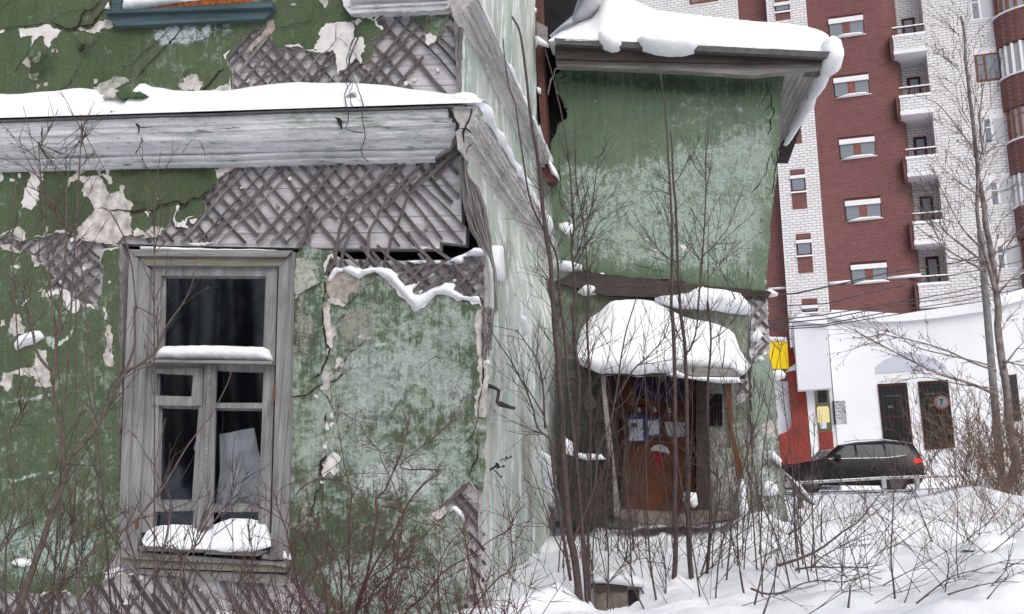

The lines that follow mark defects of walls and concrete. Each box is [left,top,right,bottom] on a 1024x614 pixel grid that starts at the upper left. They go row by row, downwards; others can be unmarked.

crack [112,23,221,82]
crack [178,69,223,91]
spalling [179,13,459,110]
leakage [554,117,772,280]
spalling [0,147,490,483]
crack [292,281,393,515]